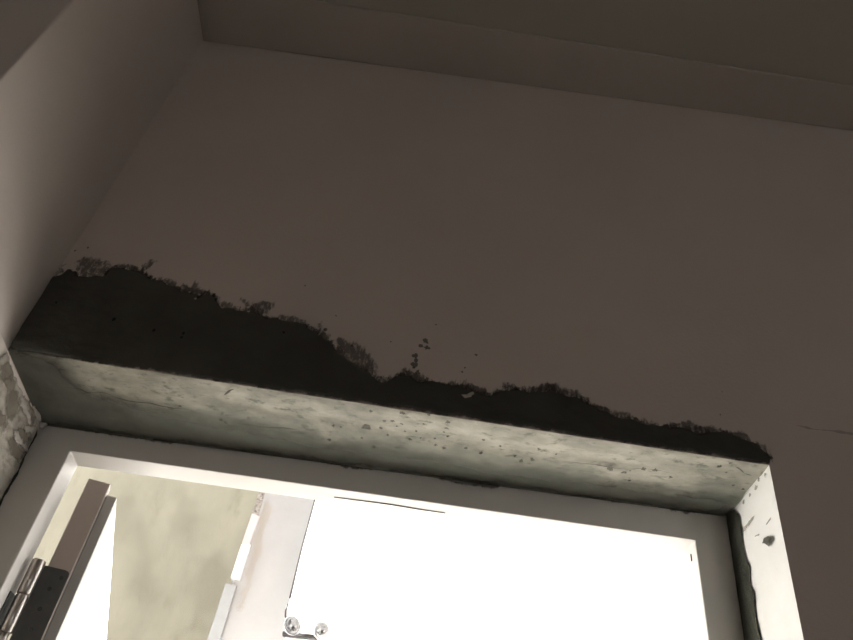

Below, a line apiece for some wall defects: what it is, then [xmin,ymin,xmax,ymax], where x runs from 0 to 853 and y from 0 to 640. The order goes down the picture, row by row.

peeling [0,352,41,500]